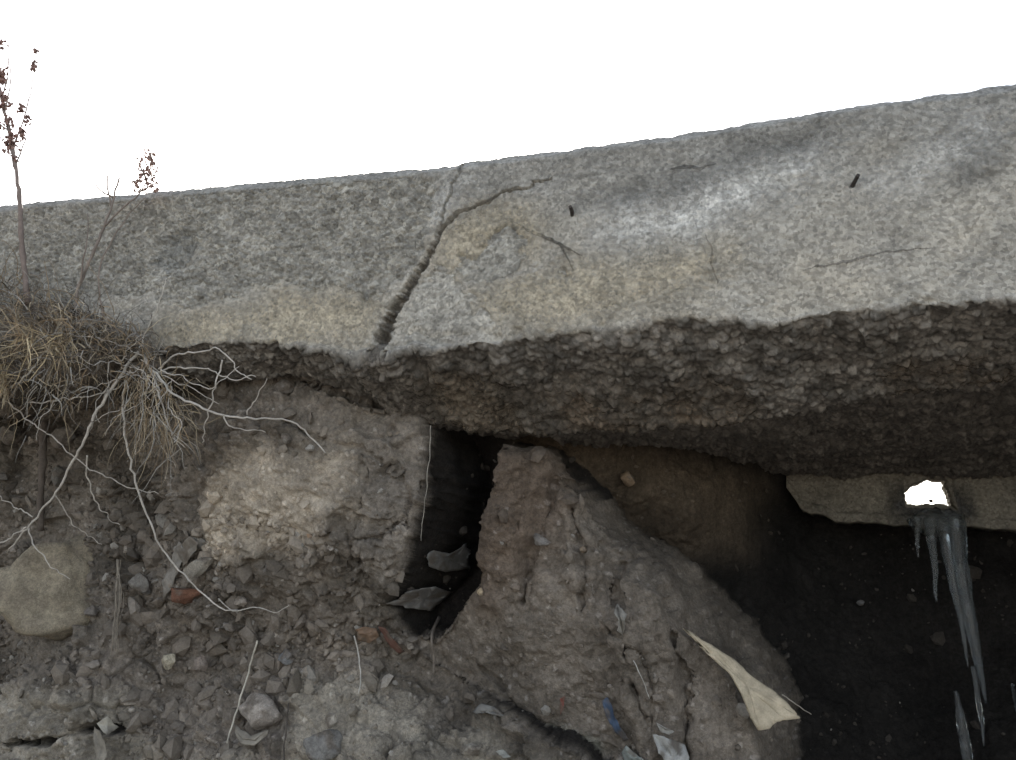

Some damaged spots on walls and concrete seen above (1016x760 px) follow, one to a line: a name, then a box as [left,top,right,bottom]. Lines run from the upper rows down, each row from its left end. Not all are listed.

crack [374,163,552,345]
crack [515,222,582,273]